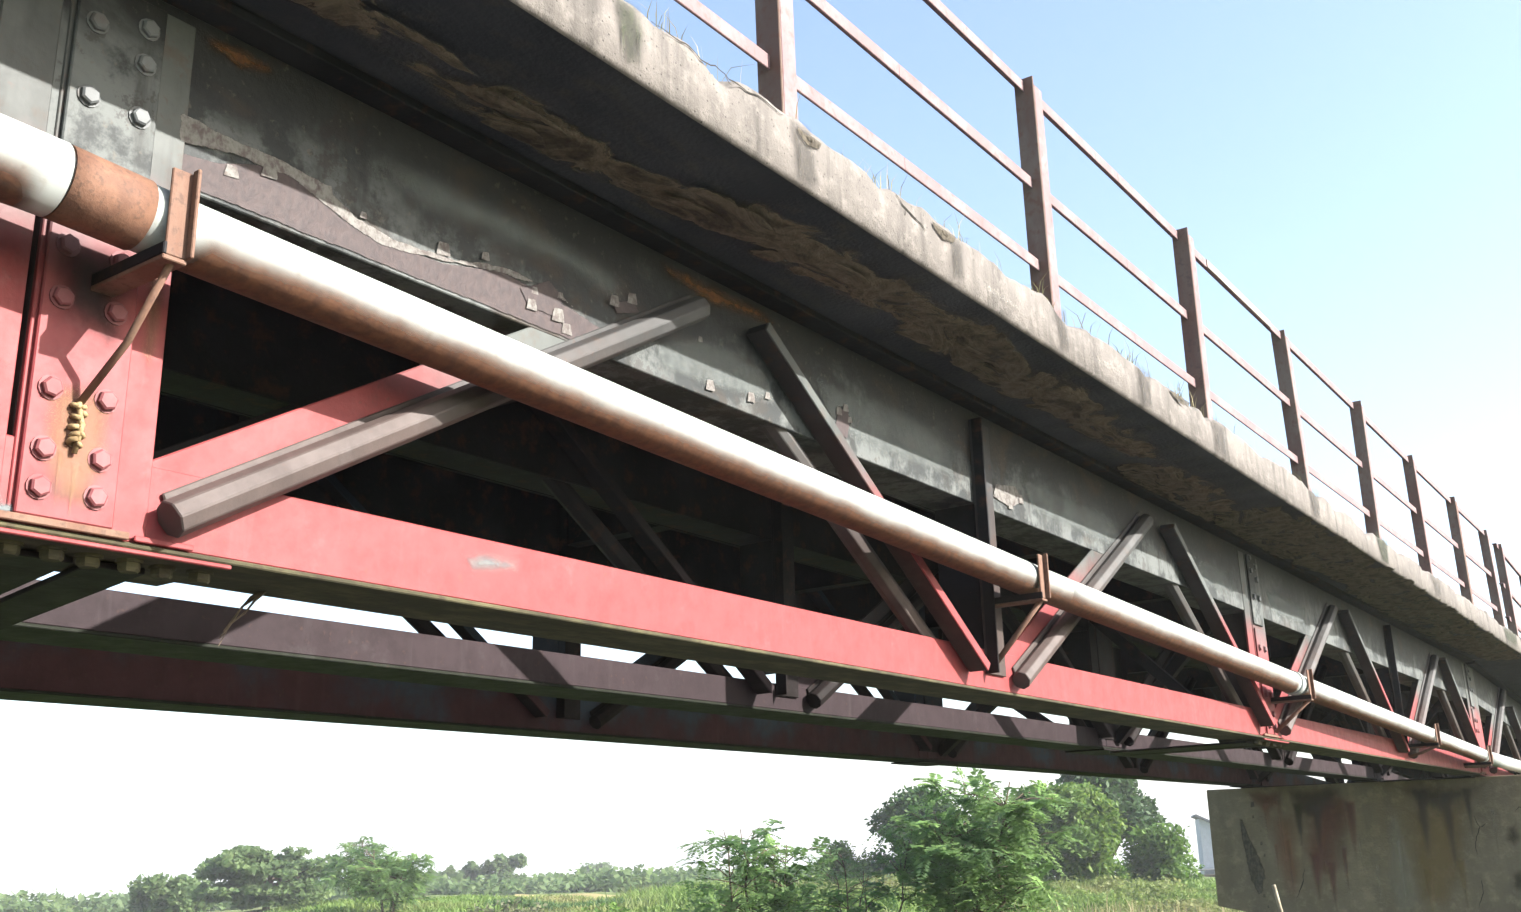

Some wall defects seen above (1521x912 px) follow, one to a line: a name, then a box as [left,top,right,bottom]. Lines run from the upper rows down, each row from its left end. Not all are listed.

peeling [180,114,599,339]
spalling [289,0,1521,662]